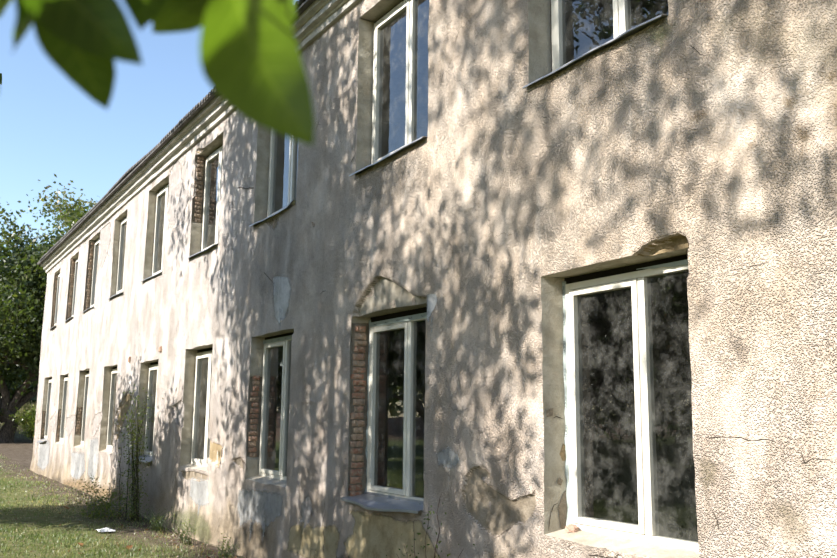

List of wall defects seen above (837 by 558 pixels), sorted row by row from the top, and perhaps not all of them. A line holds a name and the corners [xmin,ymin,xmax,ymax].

spalling [633,232,689,257]
peeling [273,277,291,323]
flaking render [348,275,427,496]
spalling [171,400,184,427]
flaking render [207,375,262,471]
peeling [180,470,209,513]
spalling [461,465,536,538]